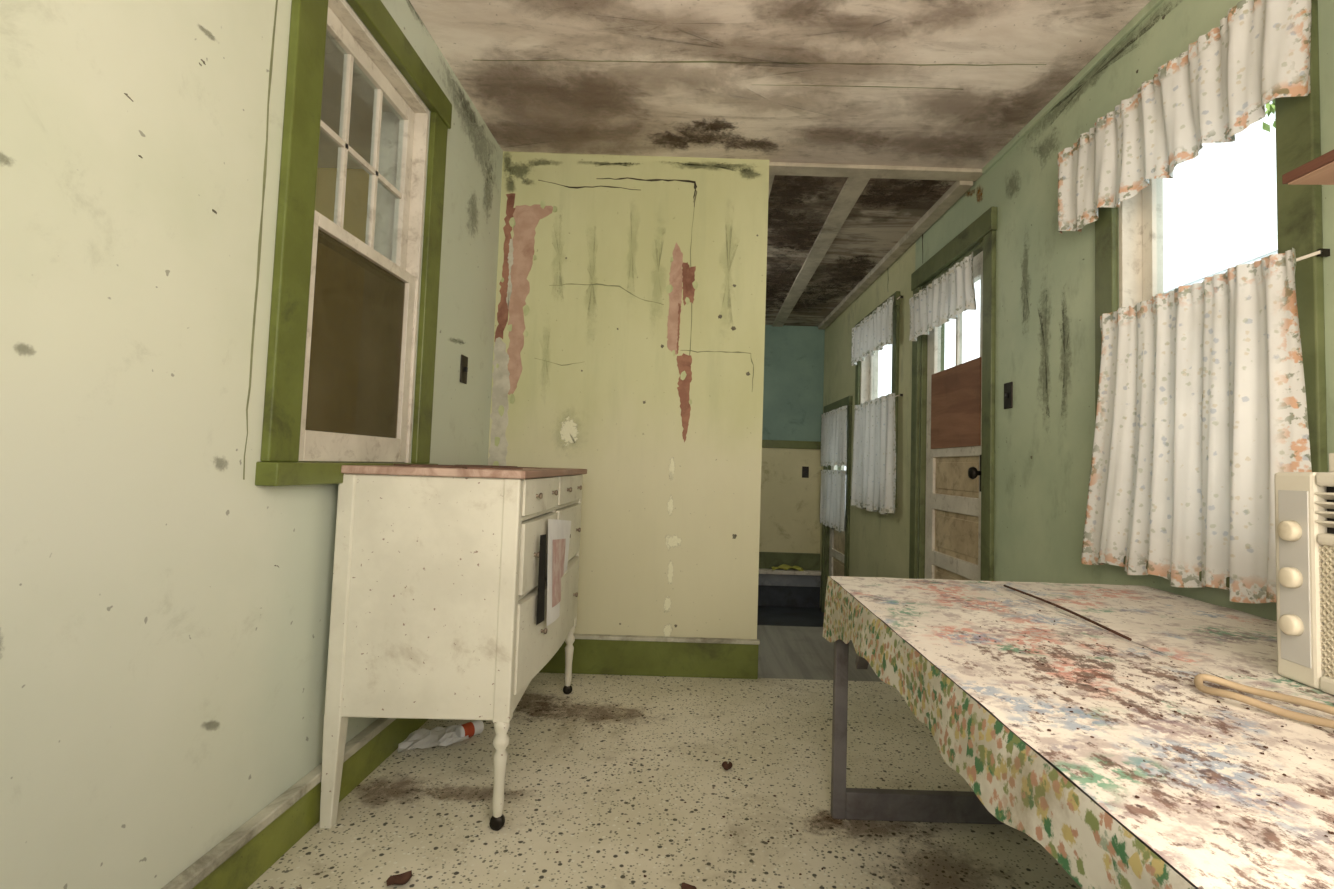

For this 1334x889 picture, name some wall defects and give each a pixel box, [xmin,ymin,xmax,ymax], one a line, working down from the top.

leakage [654,120,776,152]
leakage [766,176,875,312]
leakage [859,179,943,208]
peeling [488,193,557,466]
peeling [661,242,698,442]